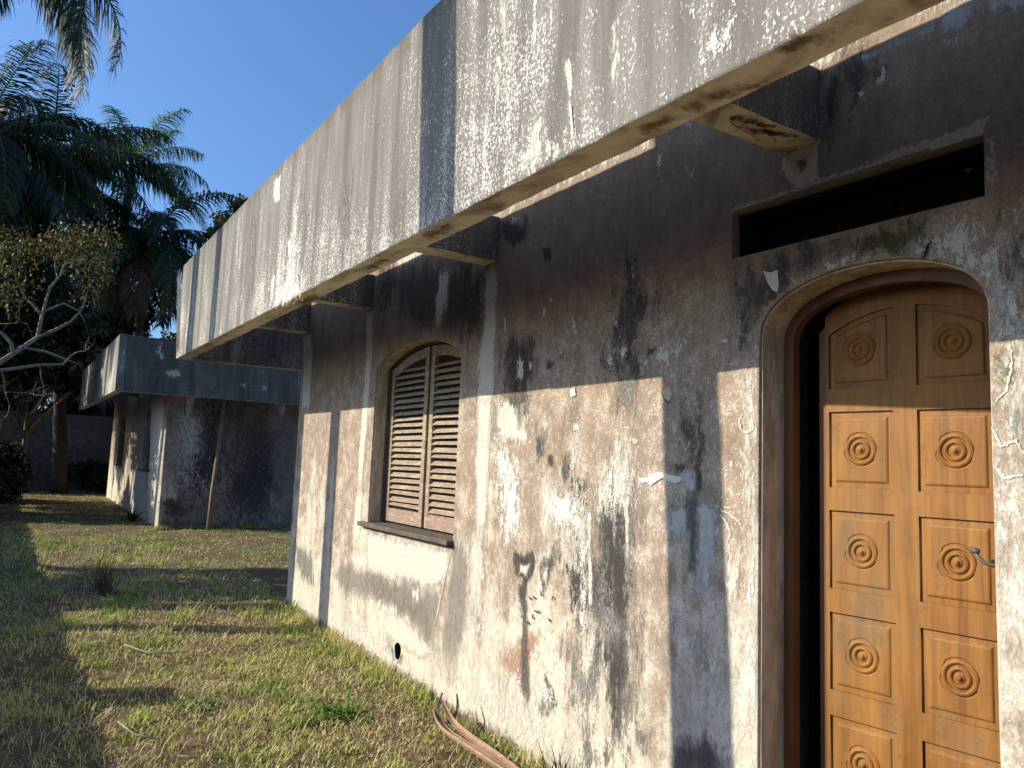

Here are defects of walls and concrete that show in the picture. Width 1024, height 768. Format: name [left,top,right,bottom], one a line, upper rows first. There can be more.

water stain [492,154,623,217]
water stain [637,118,674,150]
water stain [729,0,1024,223]
peeling [720,198,1024,351]
water stain [109,469,121,502]
water stain [133,395,289,529]
water stain [336,252,659,768]
peeling [638,467,720,601]
water stain [674,364,757,768]
water stain [283,600,548,768]